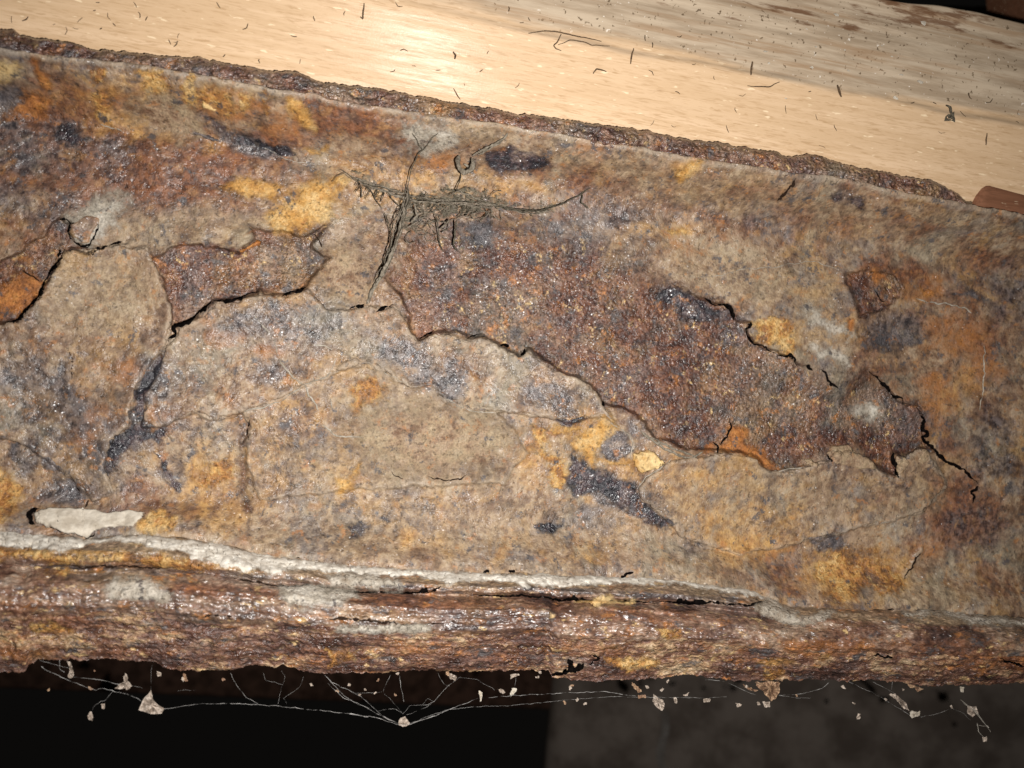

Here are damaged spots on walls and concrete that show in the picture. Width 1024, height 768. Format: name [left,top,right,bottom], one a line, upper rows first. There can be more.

rust [225,176,350,235]
spalling [0,216,99,288]
crack [8,217,122,323]
spalling [151,222,330,325]
crack [168,287,306,342]
crack [705,298,838,388]
crack [869,371,978,502]
peeling [34,507,144,538]
rust [0,547,215,576]
rust [115,673,132,690]
rust [605,656,689,711]
rust [743,665,785,708]